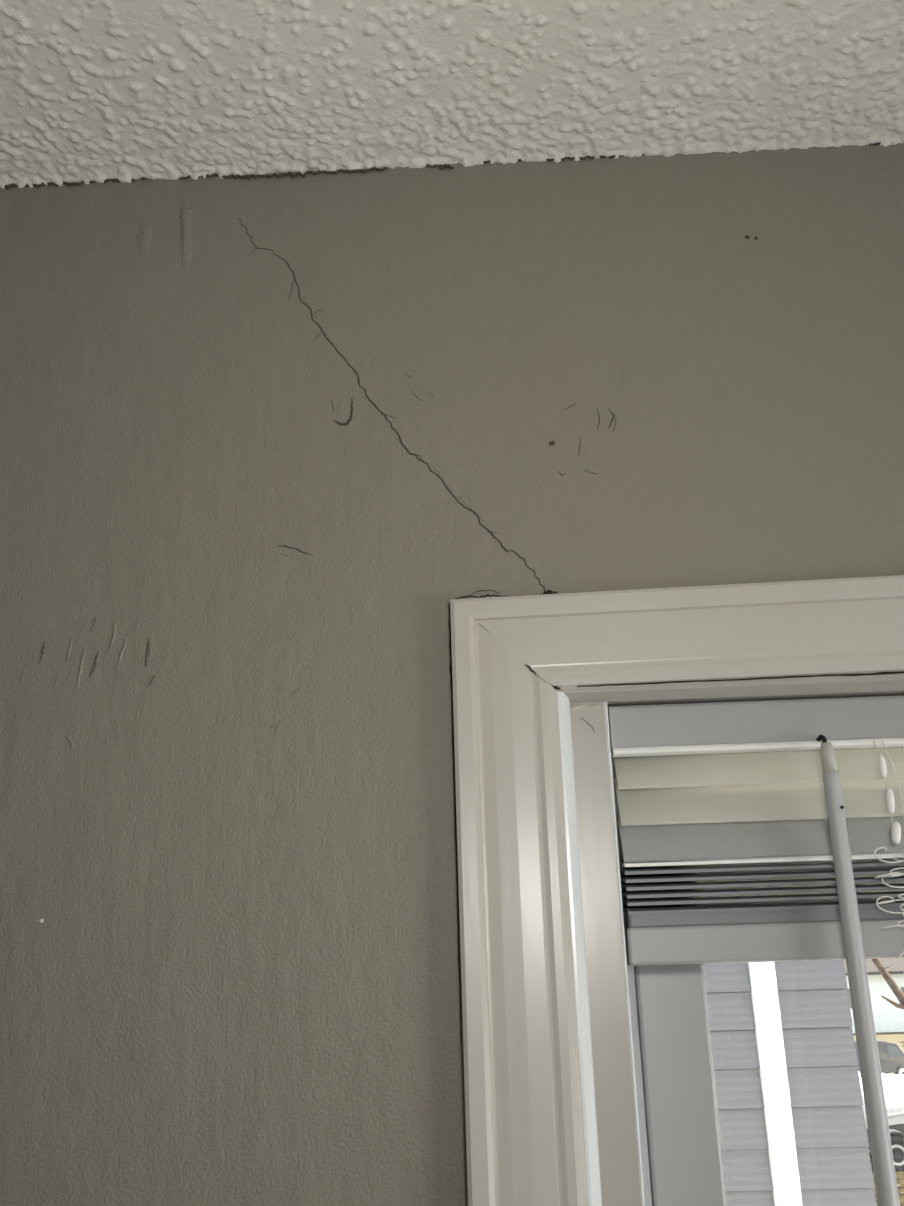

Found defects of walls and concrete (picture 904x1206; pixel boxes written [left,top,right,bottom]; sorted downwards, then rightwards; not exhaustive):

crack [239,218,545,1044]